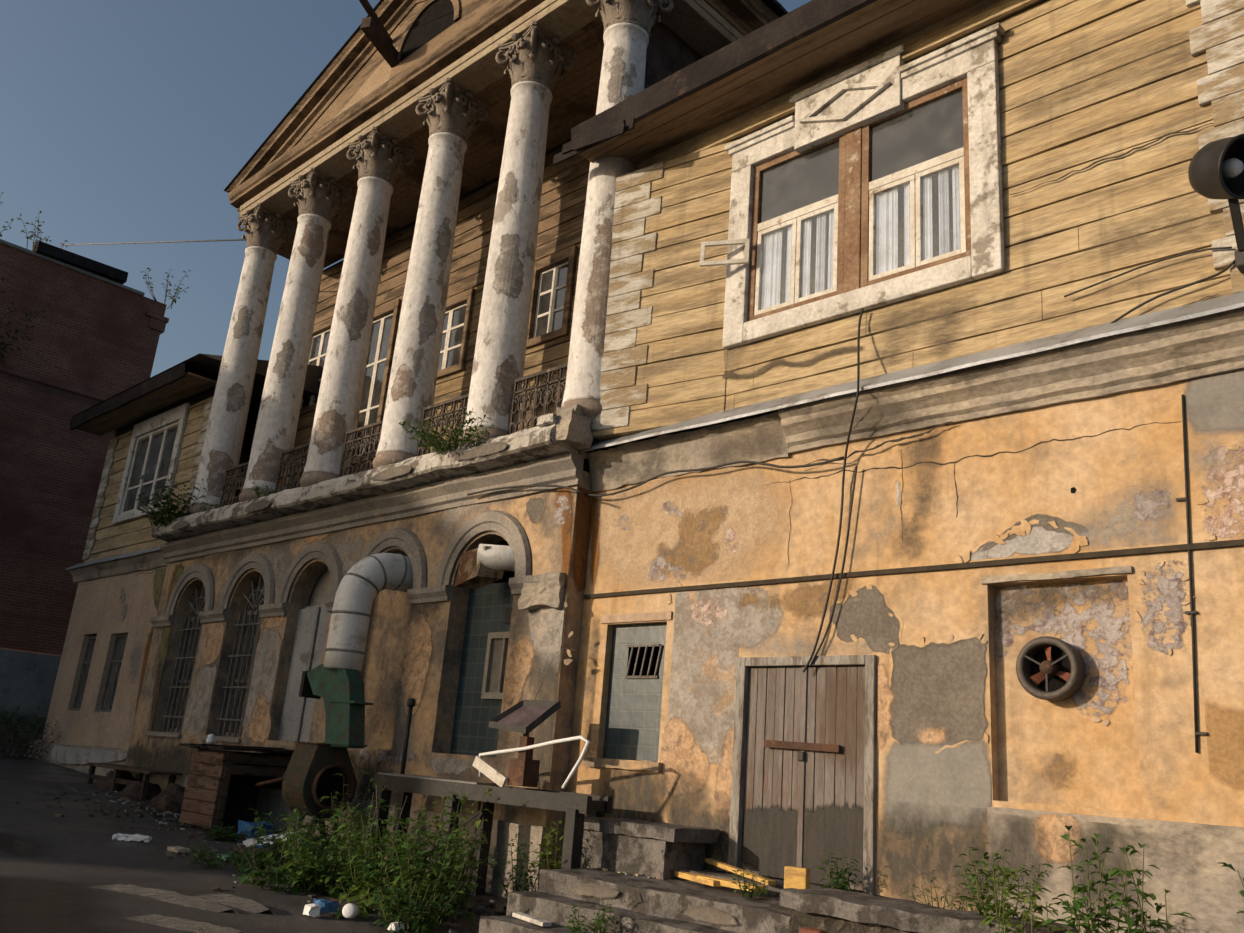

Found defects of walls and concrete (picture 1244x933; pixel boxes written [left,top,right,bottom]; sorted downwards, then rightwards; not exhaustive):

peeling [504,171,517,203]
crack [1010,123,1214,195]
peeling [345,290,369,341]
peeling [493,233,524,298]
peeling [581,218,613,357]
peeling [314,409,347,455]
crack [762,421,1182,565]
peeling [1196,444,1244,541]
peeling [648,556,741,819]
flaking render [827,560,1194,754]